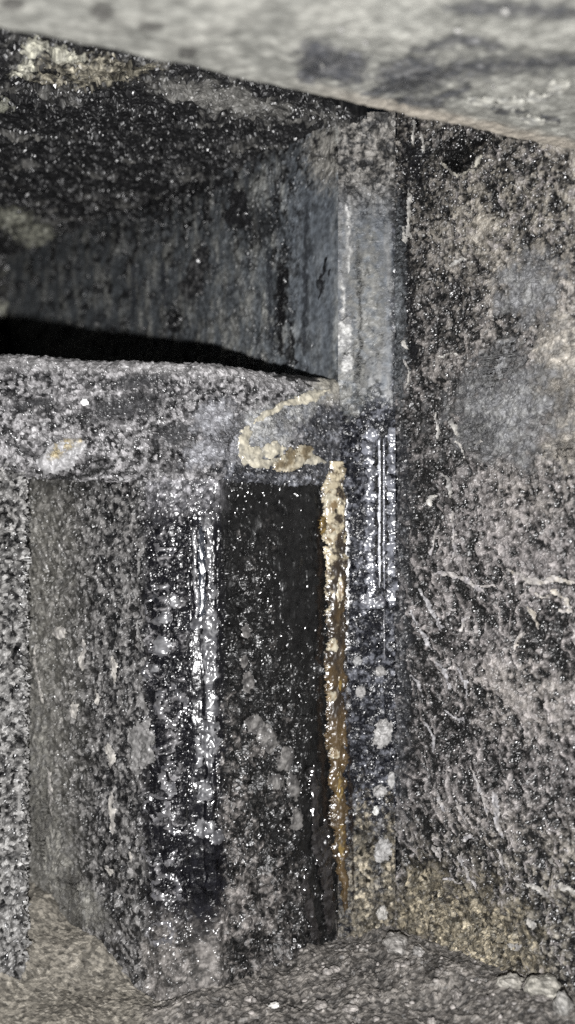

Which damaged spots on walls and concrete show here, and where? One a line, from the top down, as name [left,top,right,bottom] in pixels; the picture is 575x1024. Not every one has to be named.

rust [316,461,355,916]